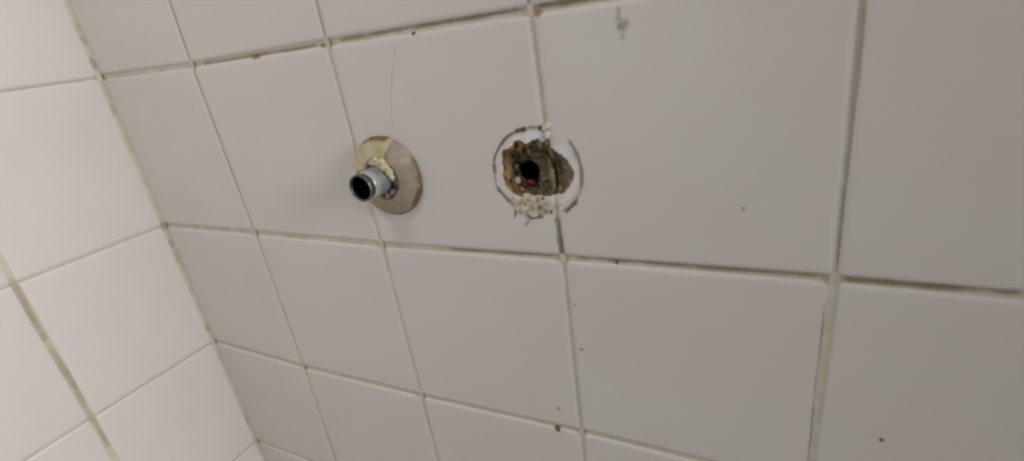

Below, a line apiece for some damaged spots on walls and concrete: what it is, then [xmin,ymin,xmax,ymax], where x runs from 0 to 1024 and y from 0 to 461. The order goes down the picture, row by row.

spalling [501,139,574,220]